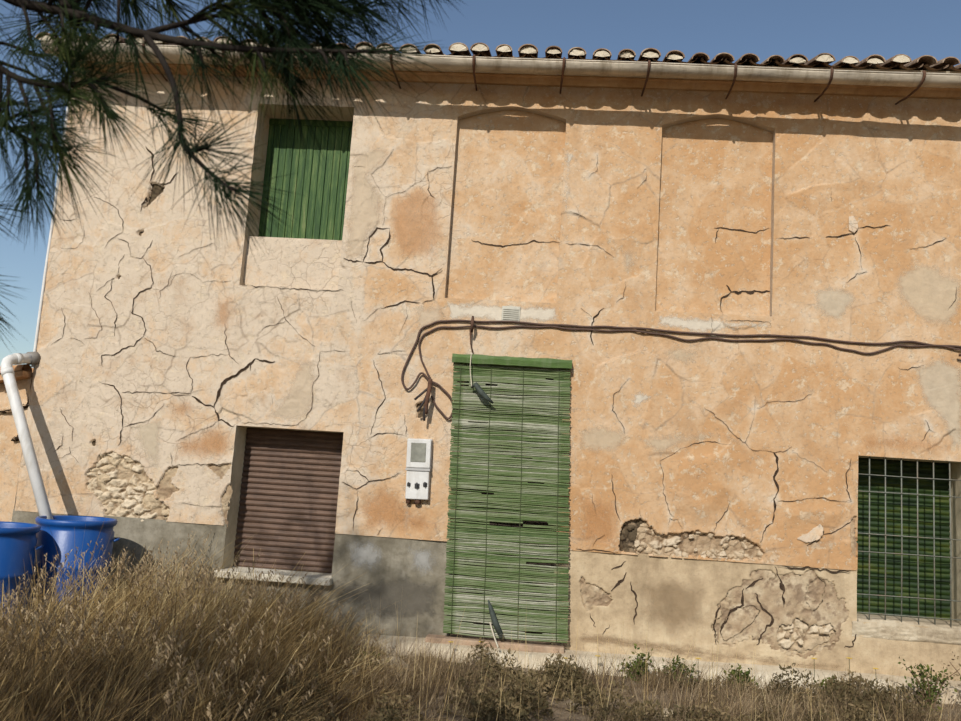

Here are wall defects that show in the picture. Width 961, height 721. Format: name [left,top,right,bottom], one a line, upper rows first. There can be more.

spalling [146,184,165,207]
crack [471,239,611,255]
crack [52,147,451,466]
spalling [86,440,179,522]
crack [343,470,396,526]
crack [660,394,851,645]
spalling [618,518,849,659]